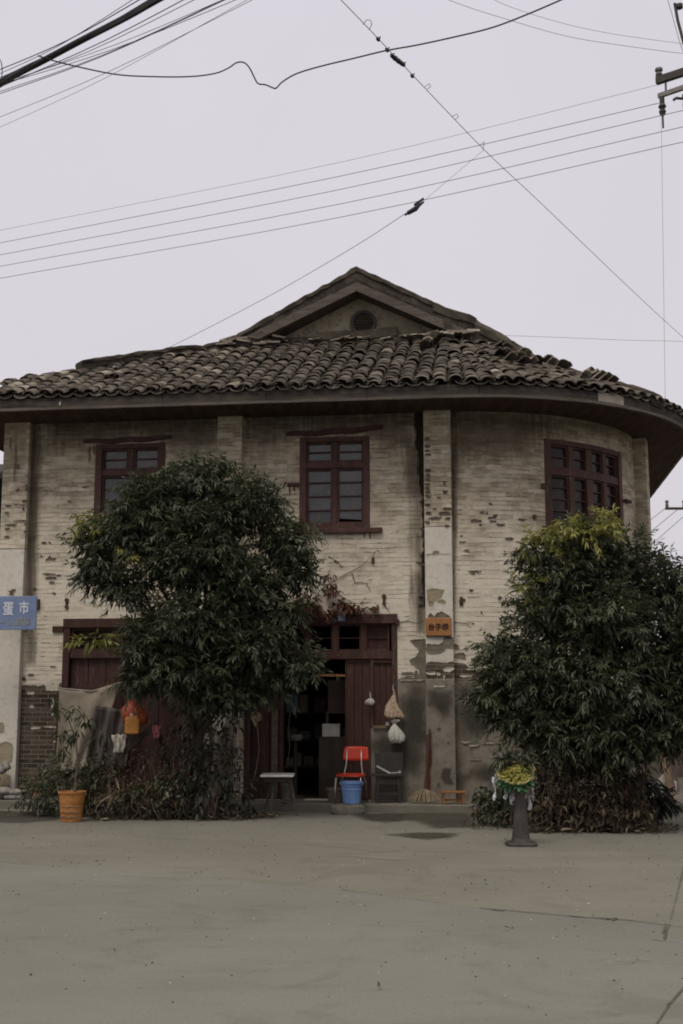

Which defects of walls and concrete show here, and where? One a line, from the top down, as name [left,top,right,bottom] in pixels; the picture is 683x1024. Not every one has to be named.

spalling [3,484,29,538]
spalling [470,502,530,550]
peeling [427,588,451,618]
spalling [400,637,485,687]
leakage [379,689,485,772]